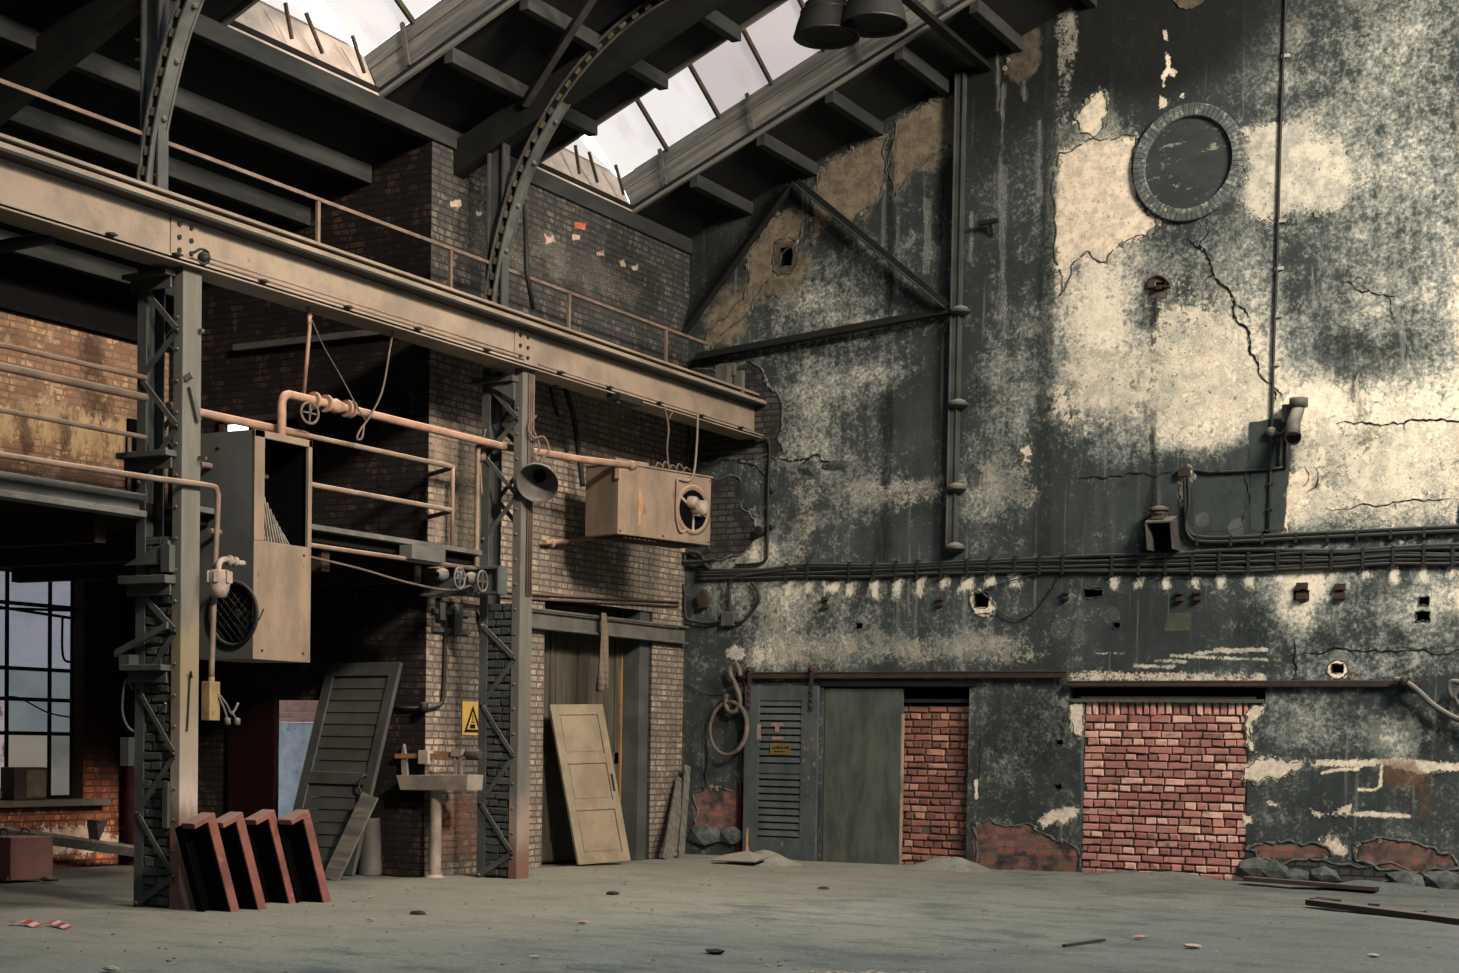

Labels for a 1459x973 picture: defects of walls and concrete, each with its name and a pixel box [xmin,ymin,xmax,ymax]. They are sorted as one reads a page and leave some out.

flaking render [1158,30,1184,109]
flaking render [1002,7,1166,297]
flaking render [688,92,968,569]
crack [1188,218,1284,402]
water stain [1388,263,1421,389]
crack [1336,418,1459,430]
spalling [1083,576,1144,600]
peeling [1389,566,1399,585]
peeling [1414,561,1459,623]
flaking render [1070,647,1268,681]
flaking render [971,783,1081,872]
flaking render [1239,703,1459,888]